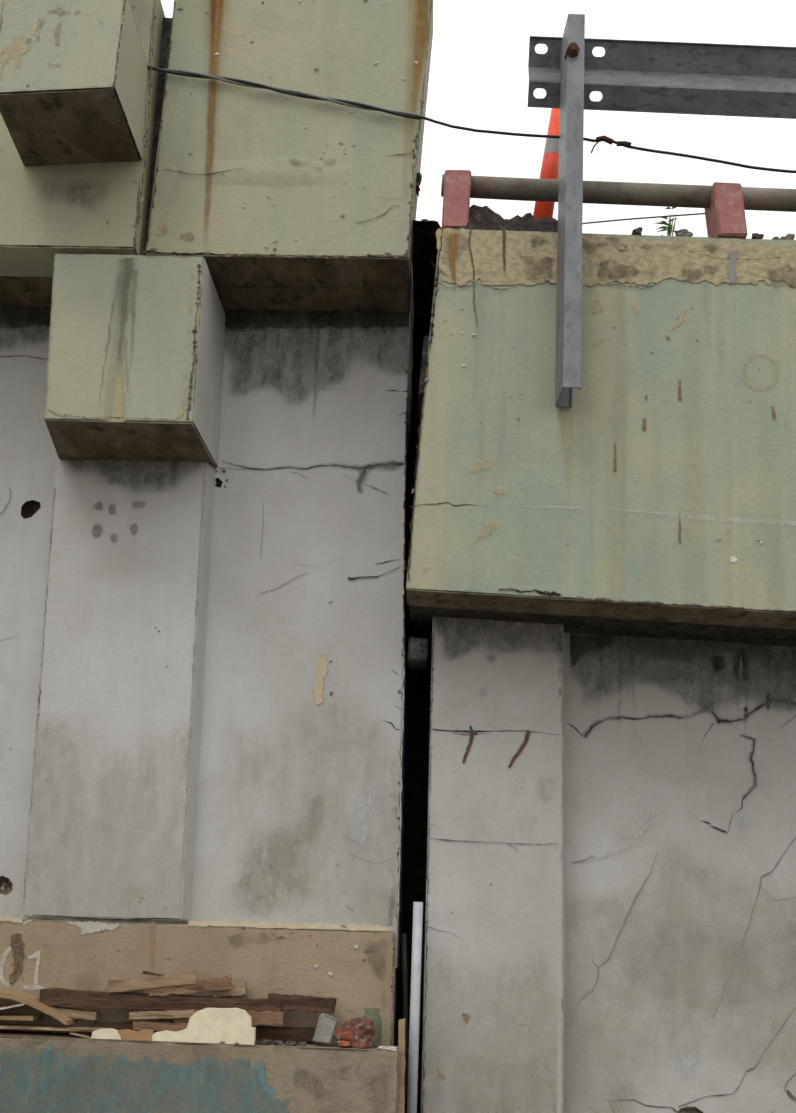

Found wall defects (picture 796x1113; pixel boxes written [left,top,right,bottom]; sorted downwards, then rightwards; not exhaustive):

rust [207,0,223,172]
spalling [582,233,796,287]
leakage [0,306,51,346]
leakage [110,258,135,422]
leakage [223,306,410,400]
crack [223,461,480,507]
spalling [21,489,56,845]
spalling [182,228,558,1046]
rust [462,733,475,764]
rust [508,730,531,768]
crack [433,699,796,833]
crack [606,1007,796,1113]